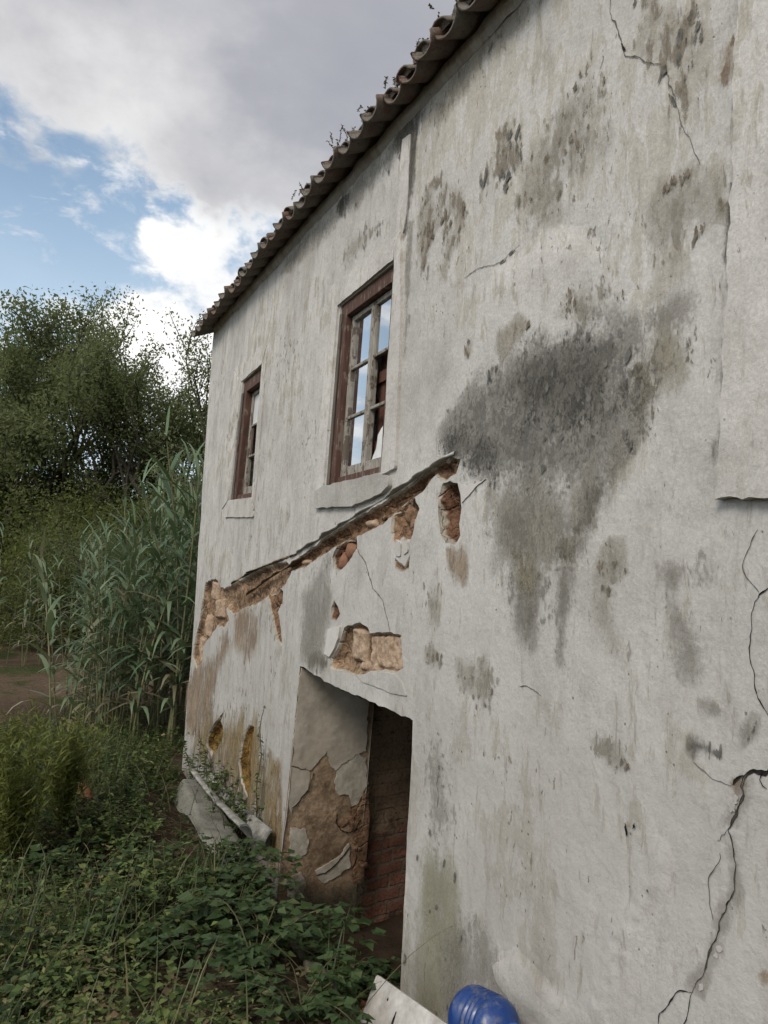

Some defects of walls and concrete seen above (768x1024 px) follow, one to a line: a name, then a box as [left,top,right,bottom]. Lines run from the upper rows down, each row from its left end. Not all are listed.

crack [610,0,700,163]
damp [438,290,697,664]
spalling [193,457,486,668]
spalling [324,601,407,696]
crack [742,529,768,714]
spalling [206,712,224,757]
spalling [238,724,254,797]
spalling [298,754,370,884]
crack [658,767,768,1024]